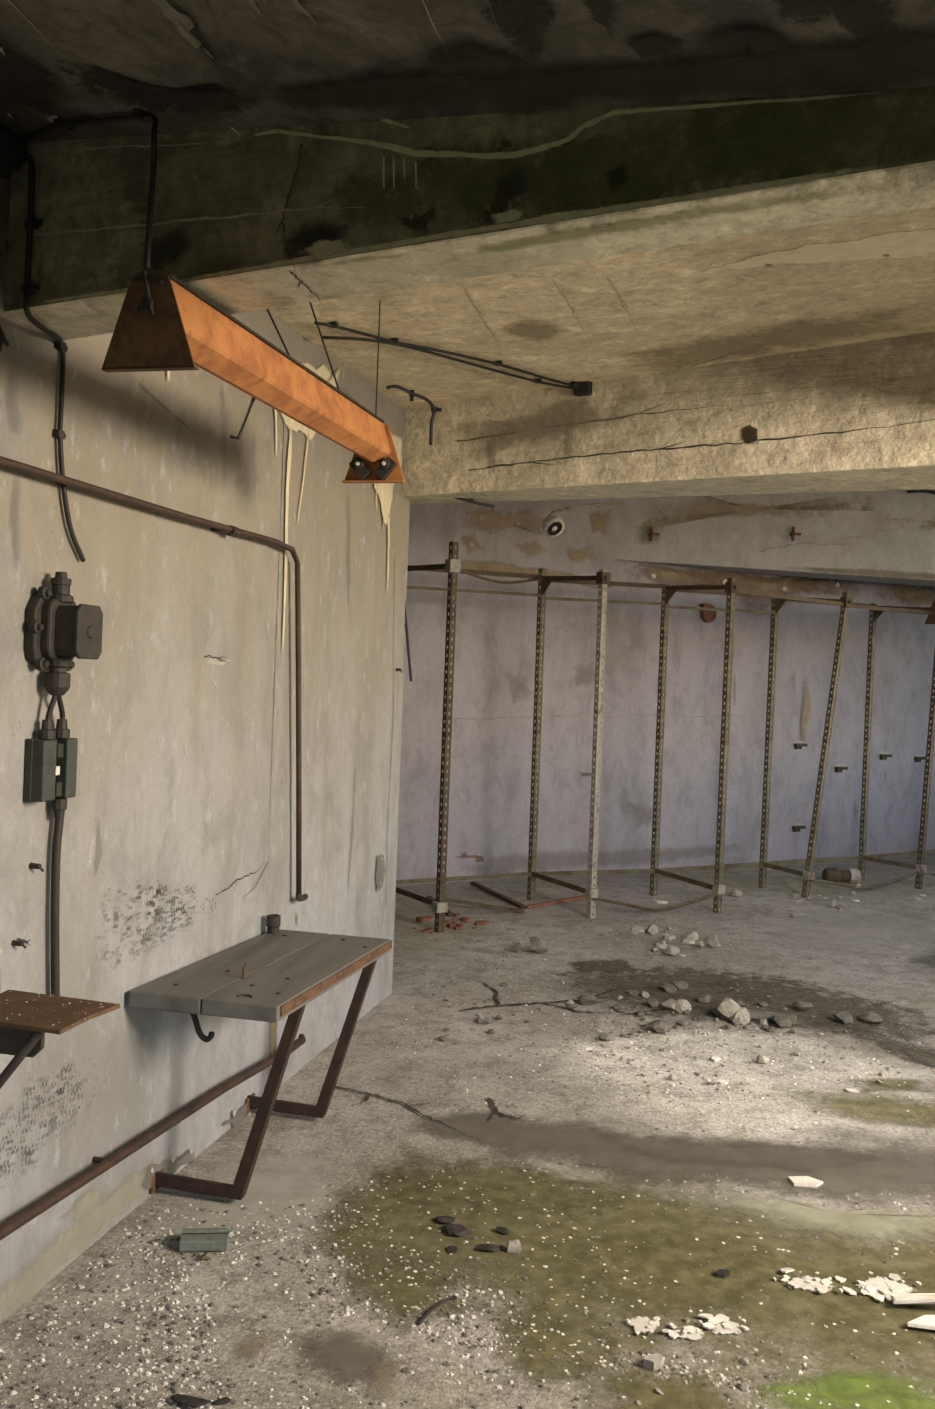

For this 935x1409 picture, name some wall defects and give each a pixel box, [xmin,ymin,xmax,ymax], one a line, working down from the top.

damp [251,0,935,196]
damp [287,224,341,265]
crack [459,977,640,1013]
damp [421,1113,935,1237]
damp [306,1332,402,1394]